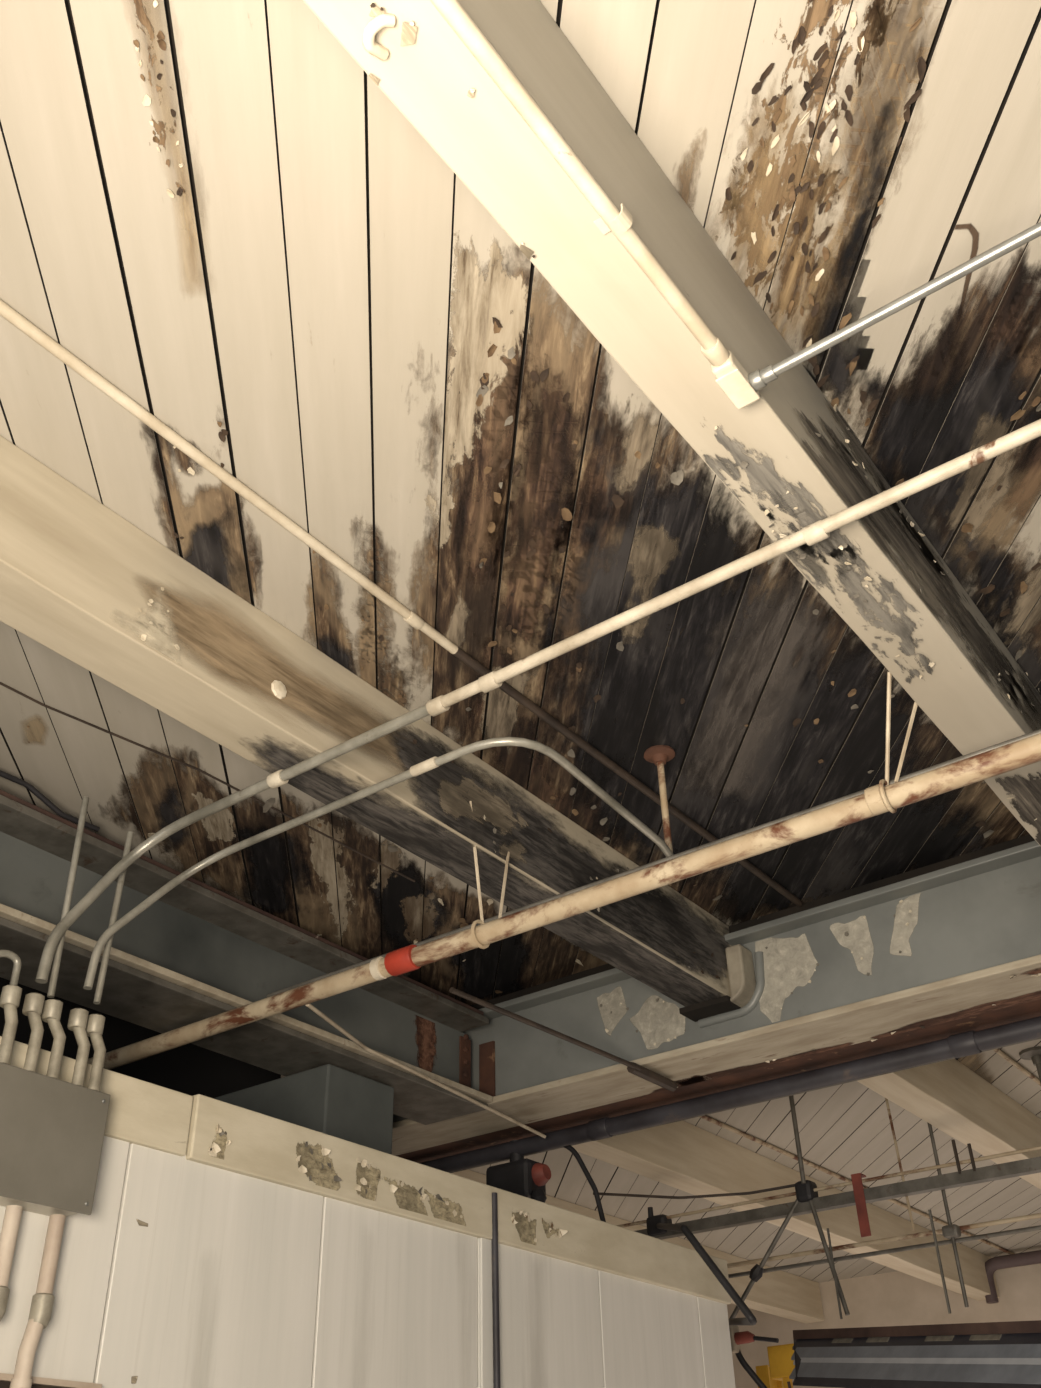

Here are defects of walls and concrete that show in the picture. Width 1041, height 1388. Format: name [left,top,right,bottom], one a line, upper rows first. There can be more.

peeling [716,0,899,348]
damp [808,0,1041,695]
damp [143,425,262,604]
damp [307,234,963,866]
peeling [703,397,1041,729]
damp [112,749,512,959]
damp [668,780,1029,925]
corrosion [415,1015,437,1073]
corrosion [644,1042,853,1096]
peeling [755,933,819,1023]
corrosion [870,968,1041,1042]
peeling [296,1141,466,1226]